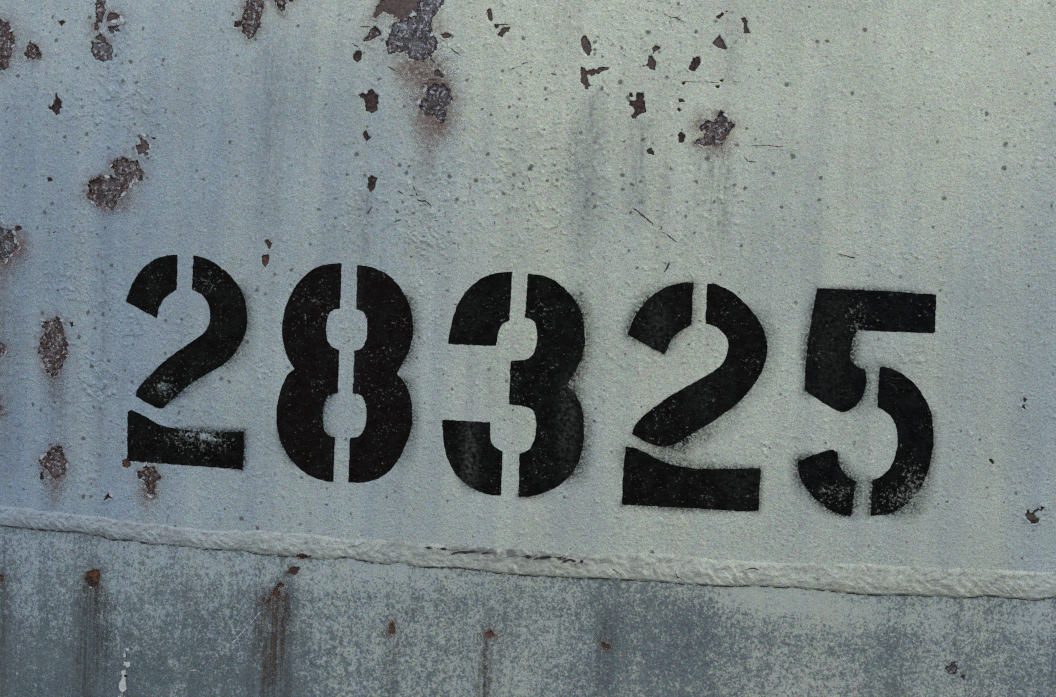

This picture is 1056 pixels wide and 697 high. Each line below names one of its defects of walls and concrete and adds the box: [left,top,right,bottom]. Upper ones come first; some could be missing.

peeling [356,89,379,113]
peeling [135,133,155,157]
rust [83,570,100,657]
rust [258,553,311,696]